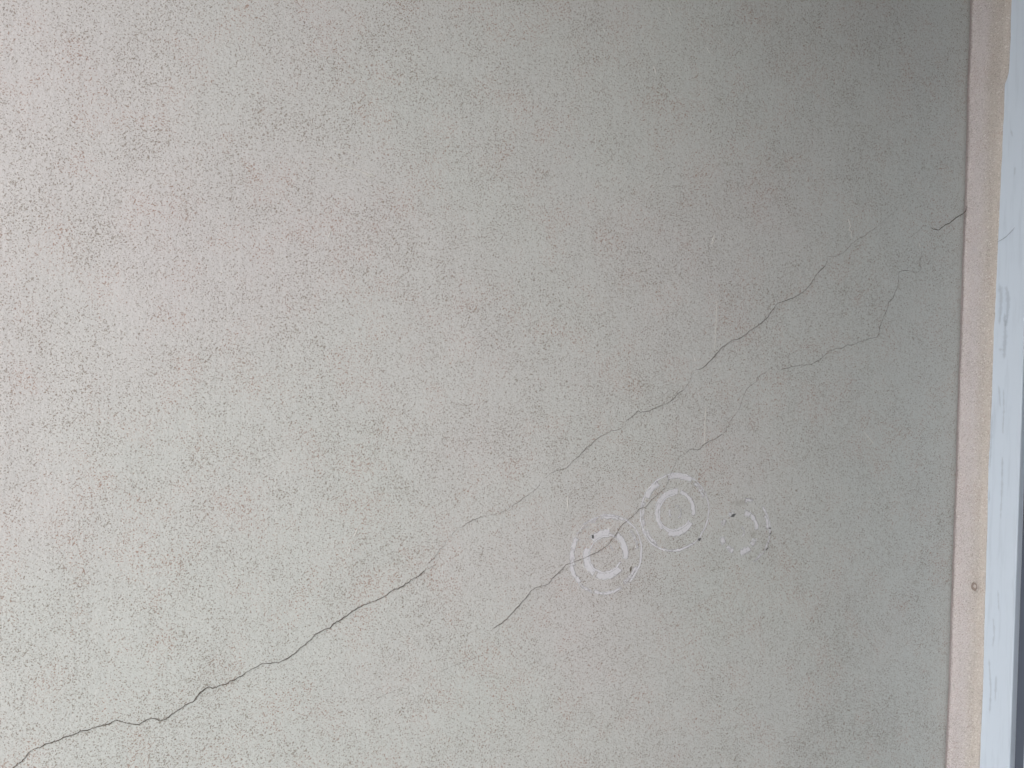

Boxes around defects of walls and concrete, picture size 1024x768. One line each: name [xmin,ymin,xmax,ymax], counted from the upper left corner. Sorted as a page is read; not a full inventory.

crack [13,213,893,768]
crack [495,207,967,628]